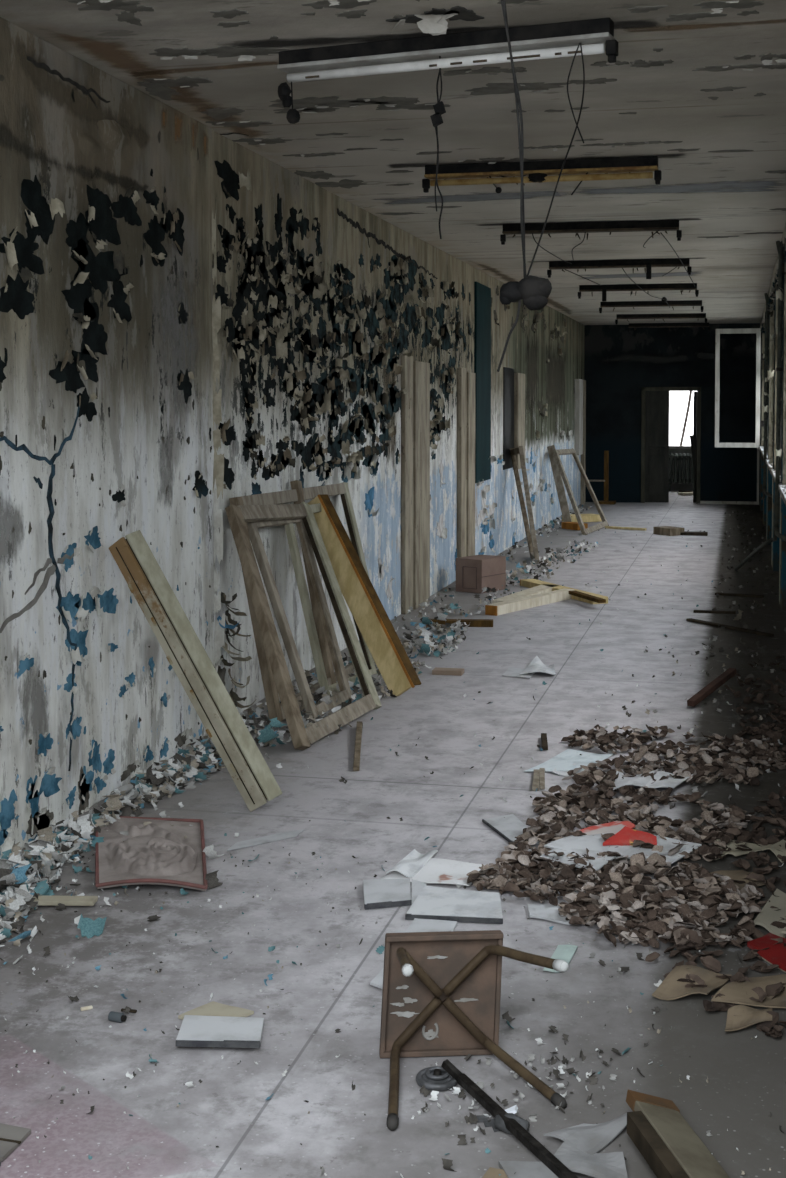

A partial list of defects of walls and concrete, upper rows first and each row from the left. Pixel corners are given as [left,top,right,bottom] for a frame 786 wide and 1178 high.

peeling [149,36,289,61]
flaking render [386,0,484,36]
peeling [443,48,674,96]
peeling [205,96,451,189]
peeling [0,166,187,422]
peeling [177,369,195,410]
peeling [184,160,472,708]
peeling [698,232,786,603]
peeling [475,454,505,555]
crack [0,406,80,771]
peeling [56,584,135,695]
peeling [0,712,213,855]